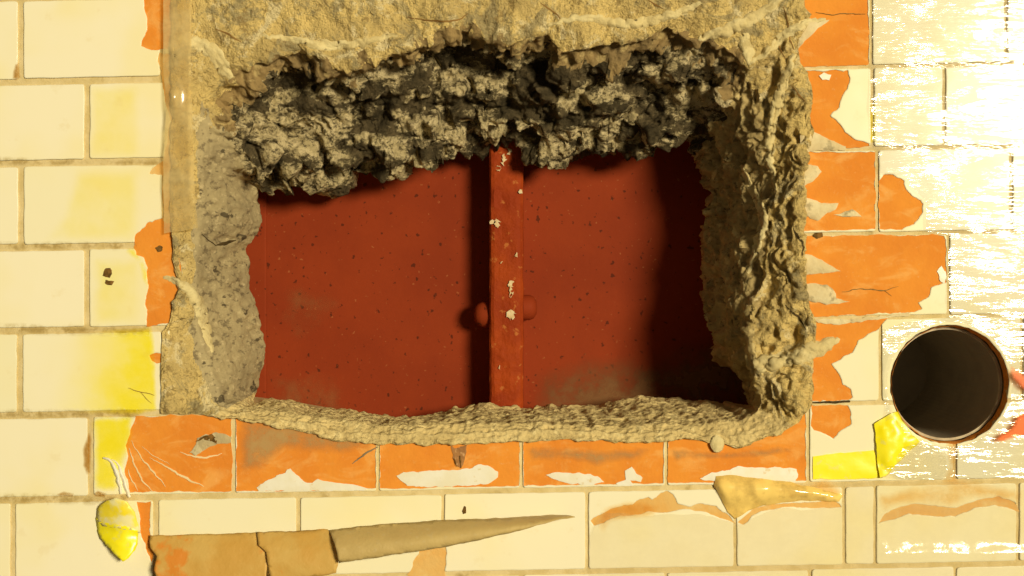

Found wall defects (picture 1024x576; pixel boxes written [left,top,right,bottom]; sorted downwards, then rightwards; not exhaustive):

spalling [125,0,947,562]